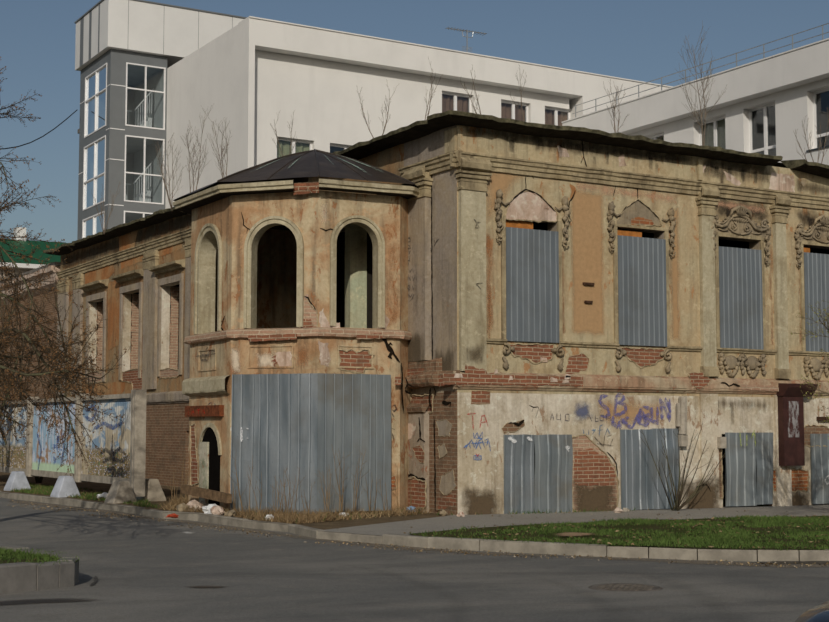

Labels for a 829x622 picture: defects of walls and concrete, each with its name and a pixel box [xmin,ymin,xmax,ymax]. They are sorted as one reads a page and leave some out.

spalling [248,294,340,342]
flaking render [275,351,292,366]
spalling [318,340,375,374]
spalling [507,343,555,364]
spalling [622,347,665,369]
spalling [408,353,589,511]
flaking render [572,434,619,512]
spalling [791,468,810,493]
damp [465,490,496,515]